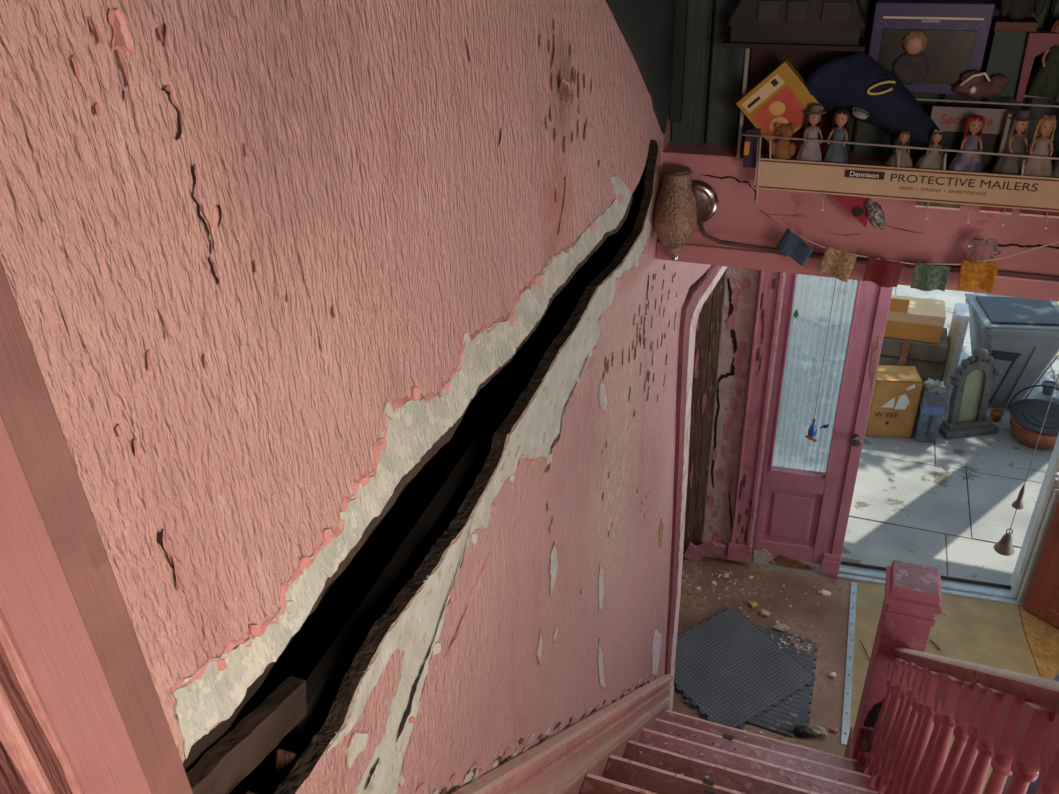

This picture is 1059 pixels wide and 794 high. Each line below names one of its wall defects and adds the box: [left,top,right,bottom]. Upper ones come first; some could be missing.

peeling [108,8,134,54]
spalling [156,24,168,48]
spalling [539,26,593,154]
spalling [598,260,677,413]
spalling [114,423,138,457]
crack [170,139,658,794]
crack [711,278,737,530]
peeling [547,503,559,596]
spalling [415,624,663,794]